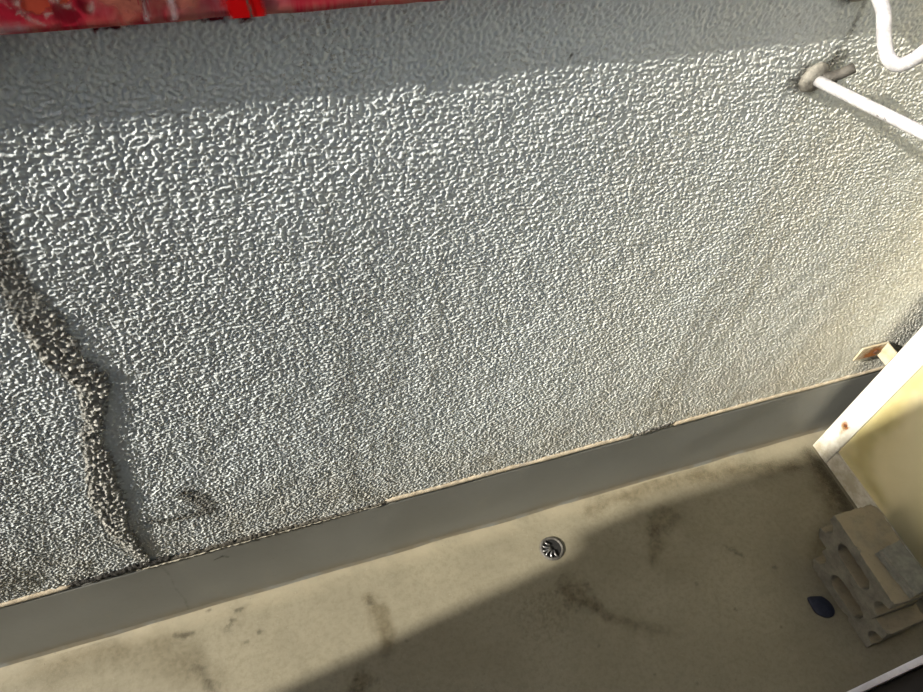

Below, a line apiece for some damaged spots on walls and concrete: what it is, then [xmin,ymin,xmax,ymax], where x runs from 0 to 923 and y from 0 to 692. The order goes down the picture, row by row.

crack [0,233,150,567]